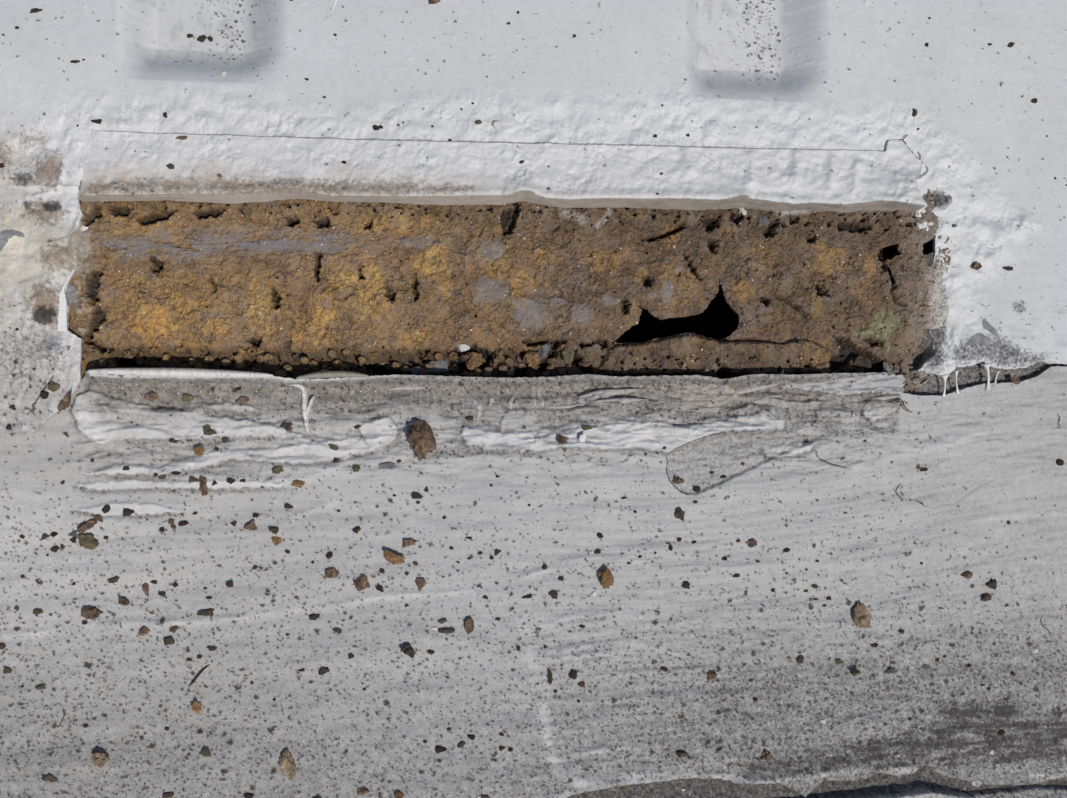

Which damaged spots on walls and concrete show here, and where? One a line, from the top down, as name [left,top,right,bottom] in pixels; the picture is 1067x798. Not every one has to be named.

crack [666,433,718,495]